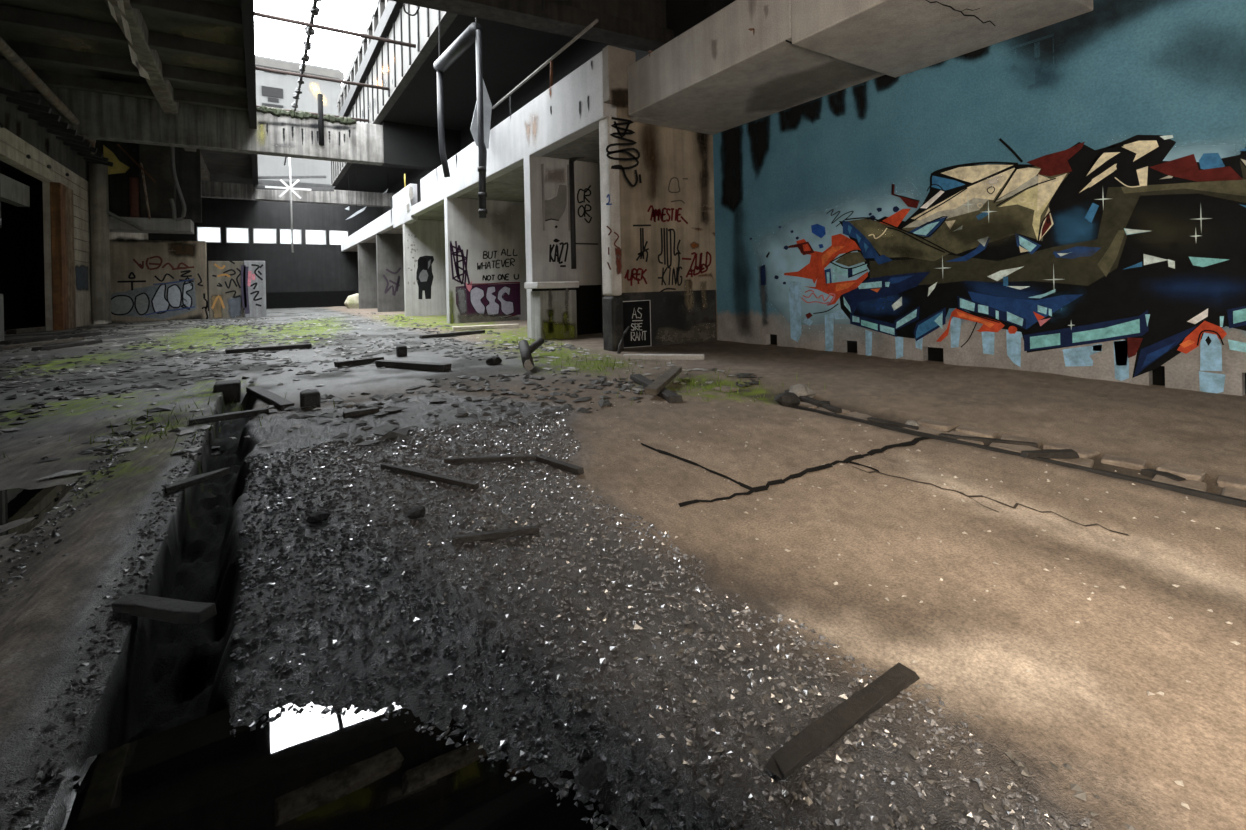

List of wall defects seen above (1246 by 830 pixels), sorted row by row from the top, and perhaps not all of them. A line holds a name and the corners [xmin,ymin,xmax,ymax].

crack [641,437,1130,536]